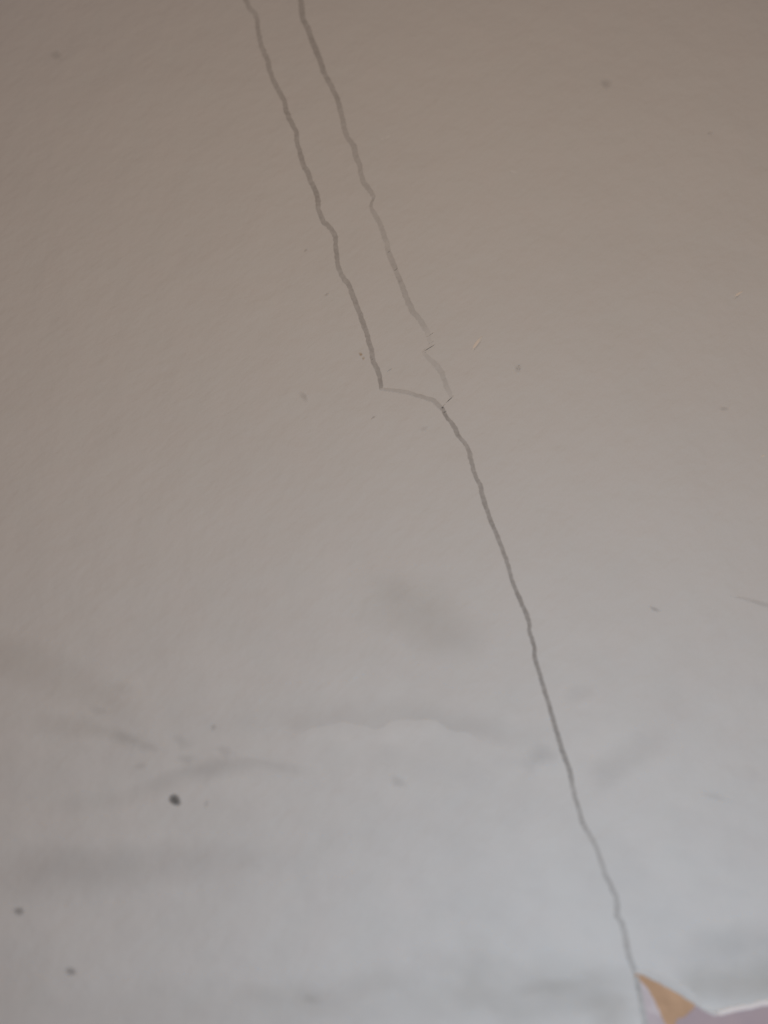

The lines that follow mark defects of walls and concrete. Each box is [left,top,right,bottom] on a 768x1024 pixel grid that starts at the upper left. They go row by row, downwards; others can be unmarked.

crack [243,0,648,1024]
peeling [634,969,768,1024]